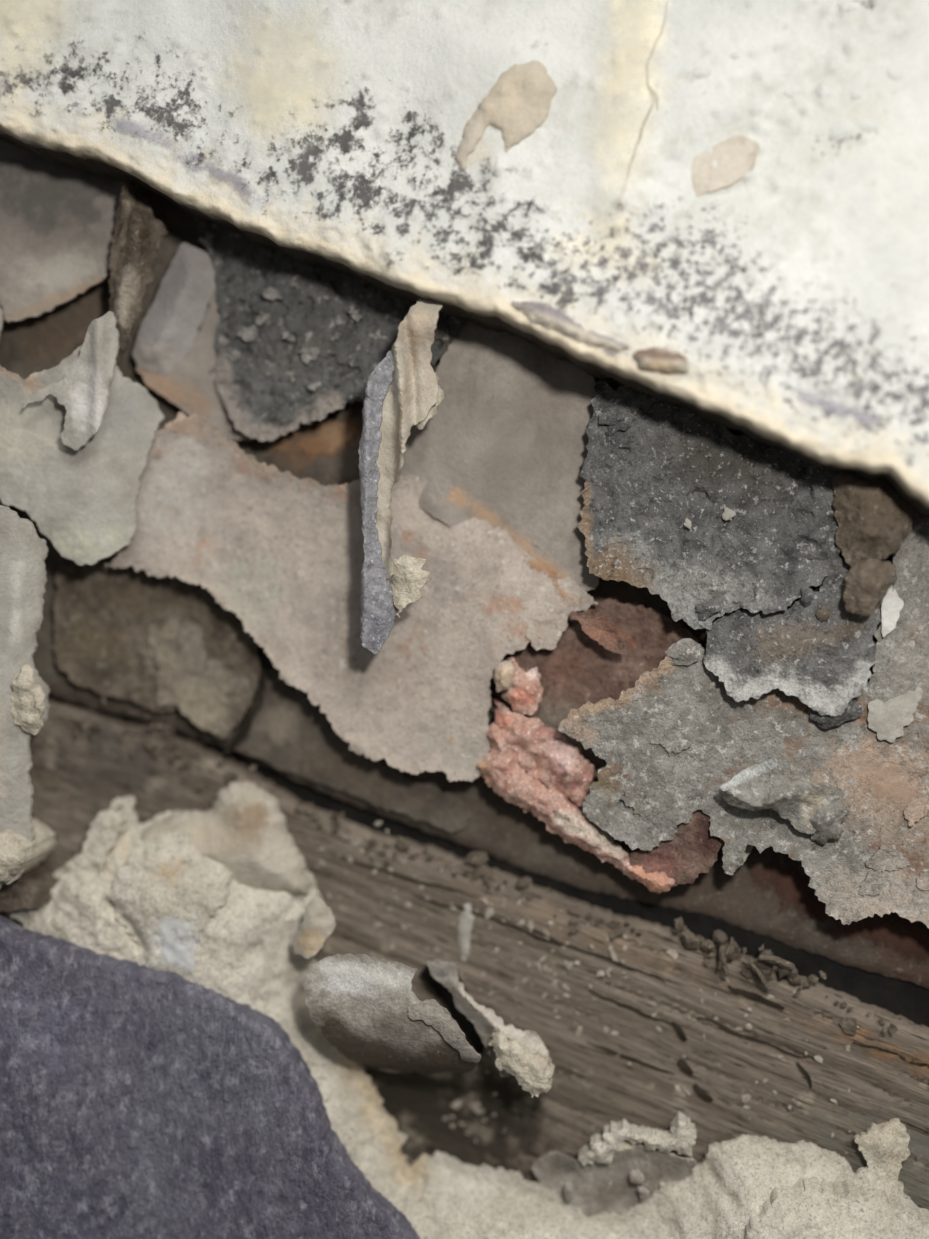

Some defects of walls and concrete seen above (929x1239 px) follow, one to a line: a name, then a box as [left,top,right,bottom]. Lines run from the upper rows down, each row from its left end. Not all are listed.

water stain [0,42,206,145]
water stain [186,89,929,447]
peeling [0,135,929,928]
peeling [140,781,555,1098]